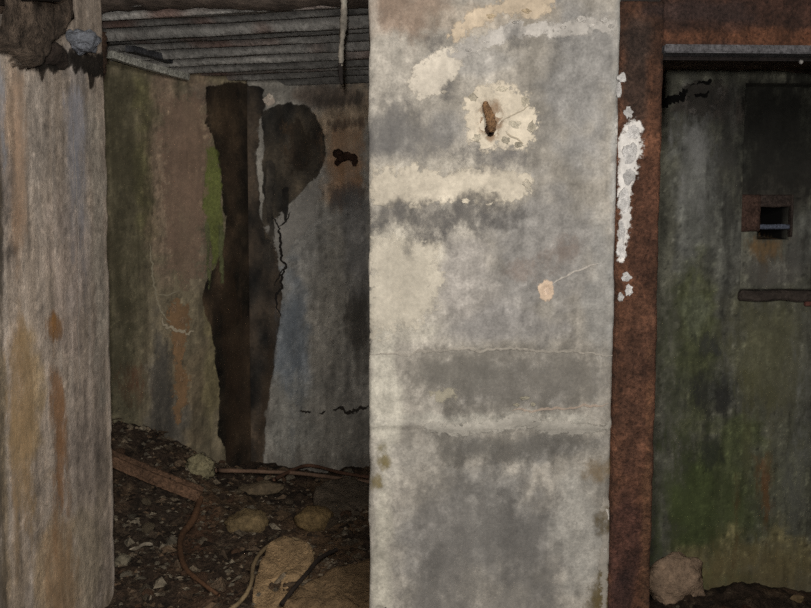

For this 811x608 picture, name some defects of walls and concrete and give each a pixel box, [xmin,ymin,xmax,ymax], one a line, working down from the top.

spalling [0,0,74,72]
water stain [202,82,326,467]
crack [299,406,369,415]